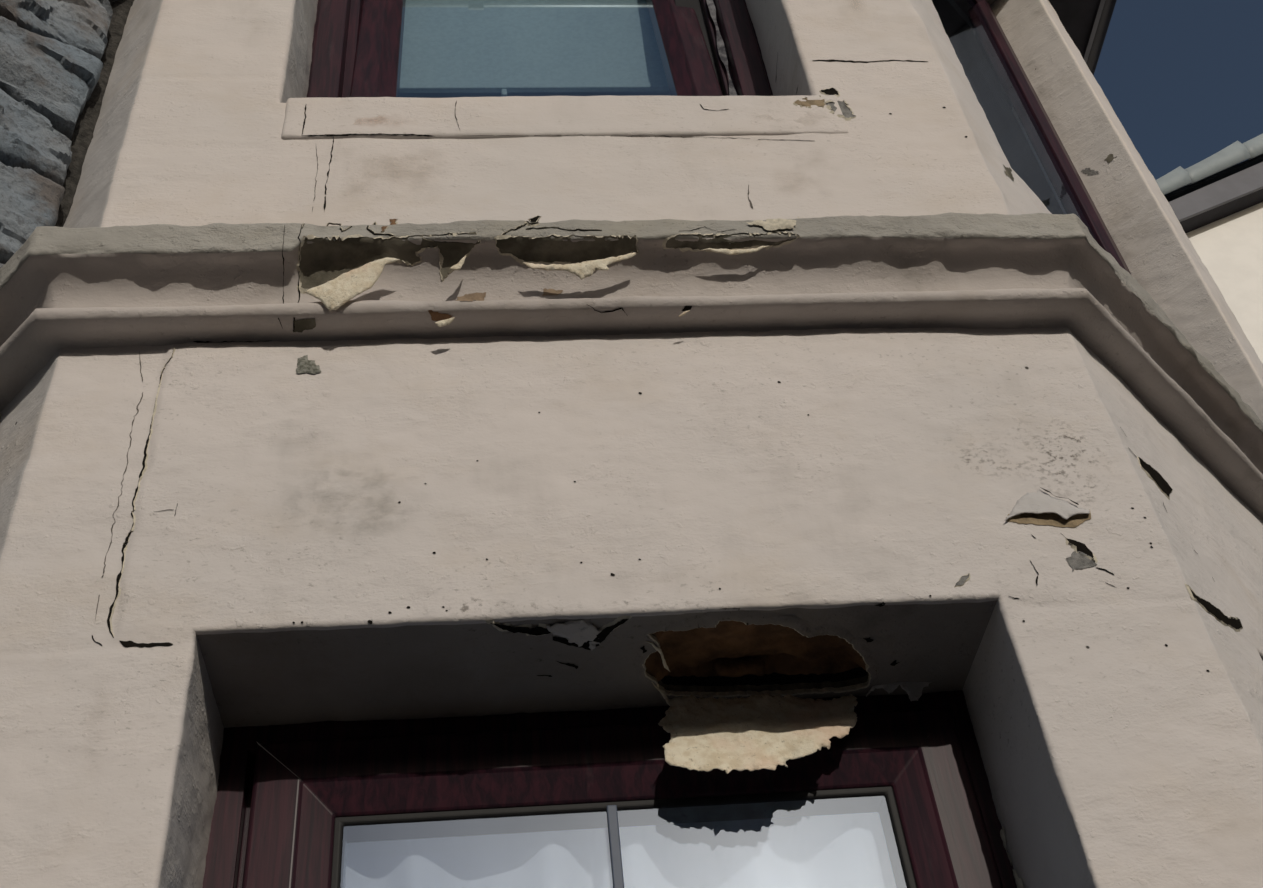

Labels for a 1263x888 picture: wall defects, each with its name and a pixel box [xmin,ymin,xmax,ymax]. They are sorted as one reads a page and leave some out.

spalling [793,88,856,121]
peeling [662,218,800,255]
peeling [296,215,639,310]
spalling [293,318,316,333]
peeling [428,310,454,327]
crack [92,101,813,648]
peeling [1005,487,1114,575]
peeling [486,615,632,650]
spalling [633,608,931,774]